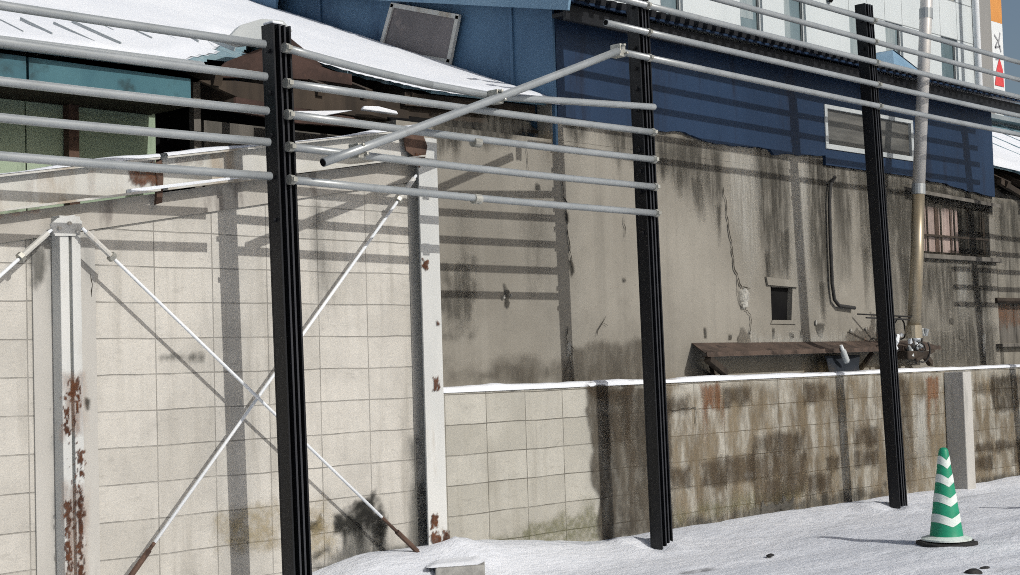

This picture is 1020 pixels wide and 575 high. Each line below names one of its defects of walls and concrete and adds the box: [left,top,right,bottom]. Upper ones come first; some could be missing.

damp [659,139,721,196]
crack [723,187,752,331]
damp [756,148,789,273]
damp [809,156,869,301]
damp [925,181,1019,246]
damp [972,262,991,307]
corrosion [60,377,87,575]
damp [318,488,426,570]
corrosion [429,513,450,544]
damp [575,343,650,540]
damp [667,378,889,529]
damp [899,375,947,493]